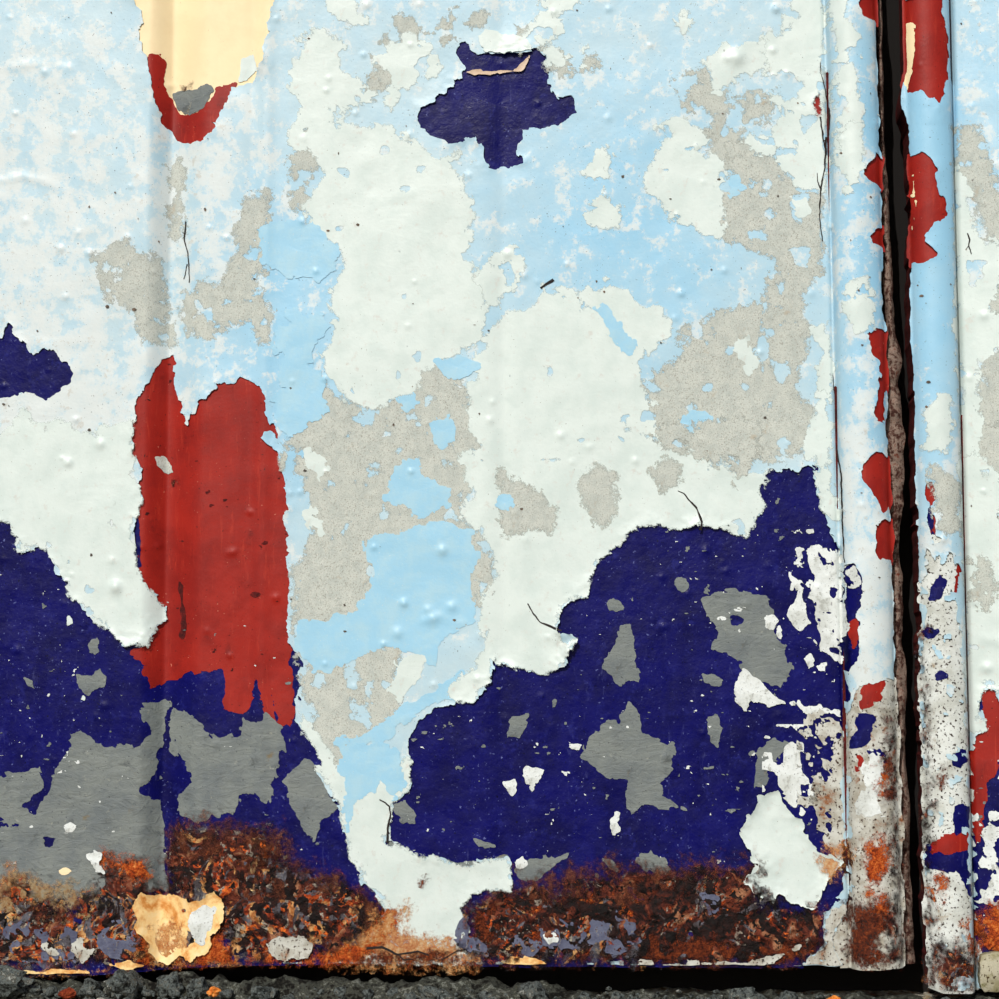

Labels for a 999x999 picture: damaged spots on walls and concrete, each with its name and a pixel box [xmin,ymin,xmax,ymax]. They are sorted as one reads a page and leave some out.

peeling [134,0,274,144]
peeling [364,5,603,170]
peeling [900,0,949,103]
peeling [0,323,73,401]
peeling [0,355,906,977]
peeling [917,462,999,994]
rust [0,810,828,977]
rust [816,840,856,884]
rust [841,716,908,968]
rust [918,800,938,871]
rust [922,893,938,932]
rust [924,900,999,990]